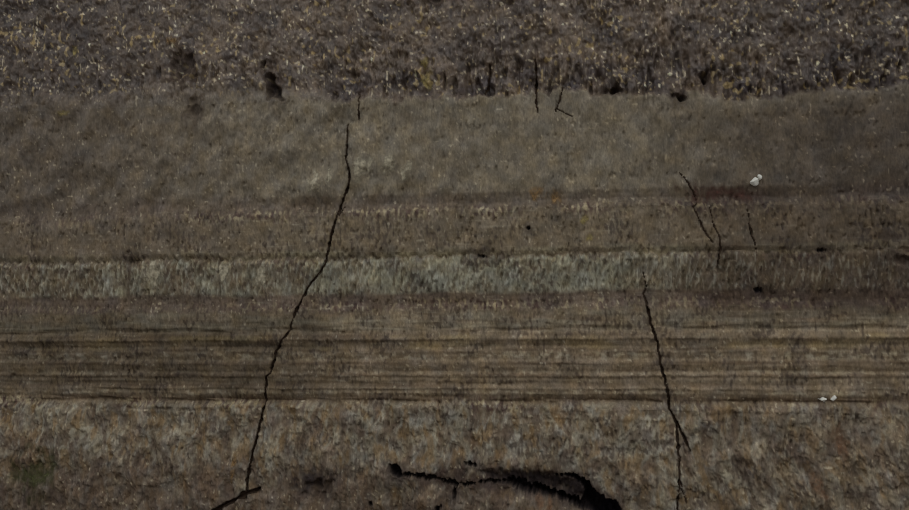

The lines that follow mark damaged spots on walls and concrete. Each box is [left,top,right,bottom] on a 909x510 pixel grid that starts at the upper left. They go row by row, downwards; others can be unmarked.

crack [212,96,360,510]
crack [643,273,691,510]
crack [679,172,721,266]